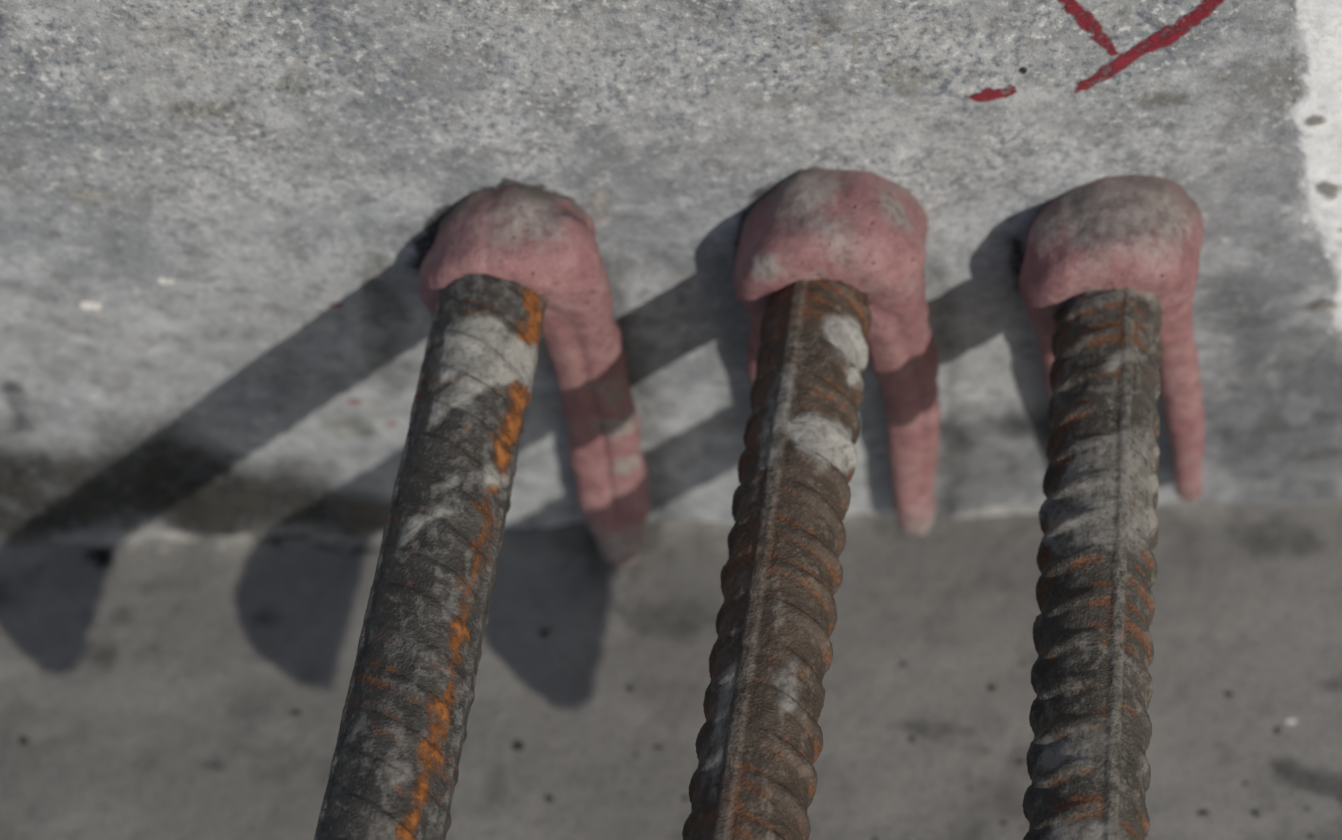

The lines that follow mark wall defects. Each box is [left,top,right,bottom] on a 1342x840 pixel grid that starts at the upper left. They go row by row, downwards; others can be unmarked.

leakage [0,435,389,545]